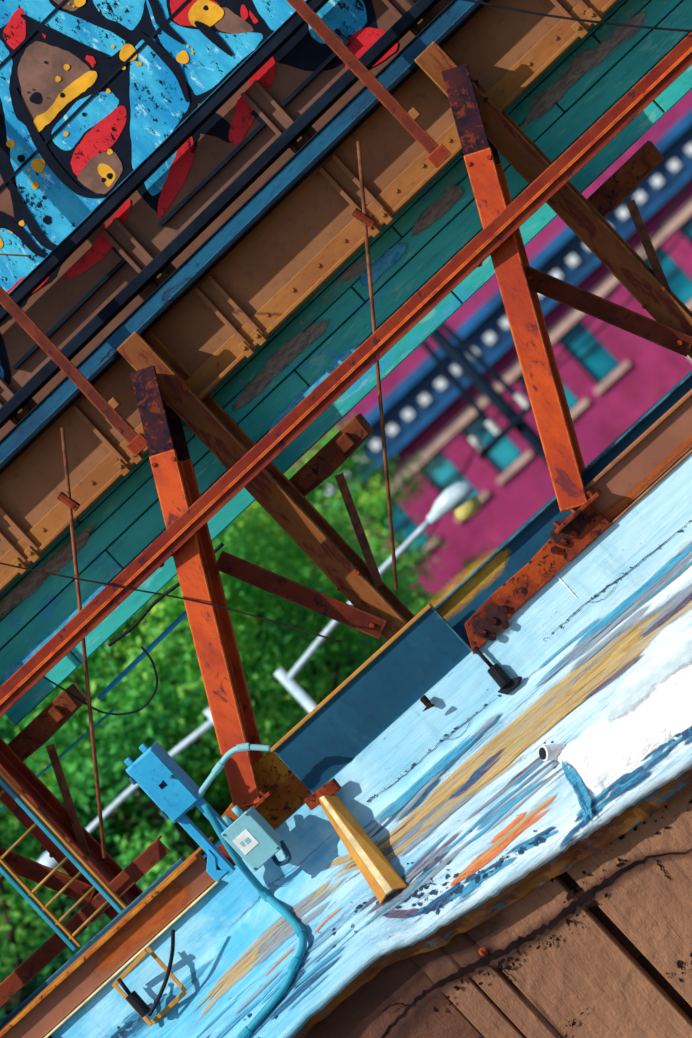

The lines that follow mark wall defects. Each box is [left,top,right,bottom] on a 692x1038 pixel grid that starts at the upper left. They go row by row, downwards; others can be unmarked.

peeling [521,12,646,128]
peeling [360,184,463,285]
peeling [232,319,330,410]
corrosion [550,514,586,544]
corrosion [431,550,508,618]
corrosion [472,602,510,639]
crack [236,841,325,921]
corrosion [96,885,187,970]
crack [377,849,692,1038]